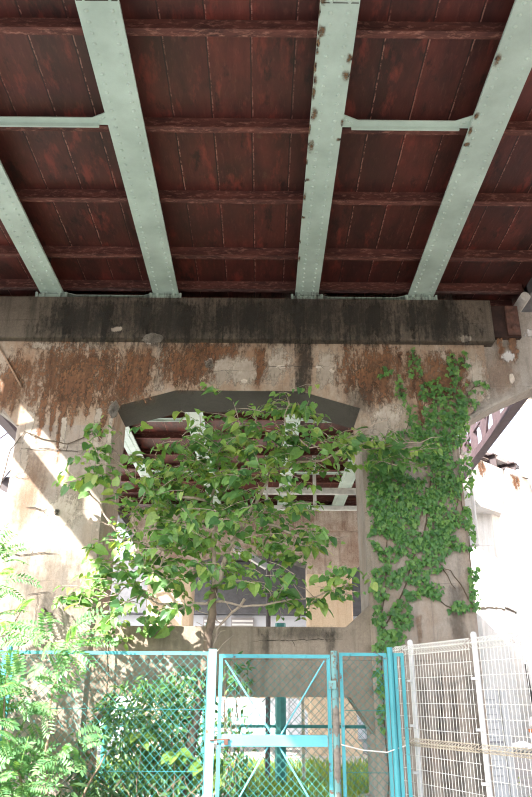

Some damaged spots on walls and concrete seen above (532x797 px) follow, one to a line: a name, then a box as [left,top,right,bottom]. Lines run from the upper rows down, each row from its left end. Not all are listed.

rust [0,341,267,460]
water stain [25,292,483,394]
rust [335,344,470,428]
crack [480,606,517,614]